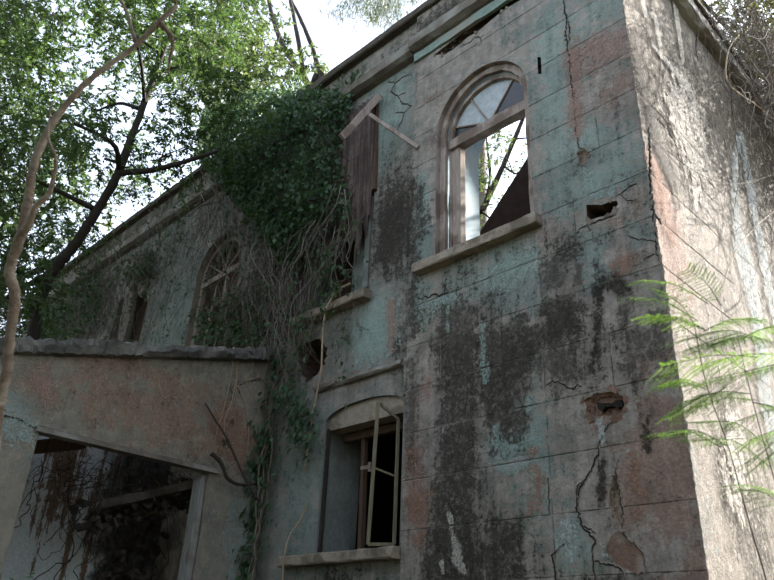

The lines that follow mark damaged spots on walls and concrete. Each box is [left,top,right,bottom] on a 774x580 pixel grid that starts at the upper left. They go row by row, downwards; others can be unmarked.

crack [388,74,412,131]
damp [371,176,435,340]
crack [563,0,580,148]
spalling [576,148,619,226]
damp [626,21,698,211]
damp [640,0,686,86]
crack [614,116,716,261]
hole [298,337,330,383]
damp [420,254,679,580]
spalling [580,384,628,445]
crack [575,421,646,580]
spalling [603,472,646,574]